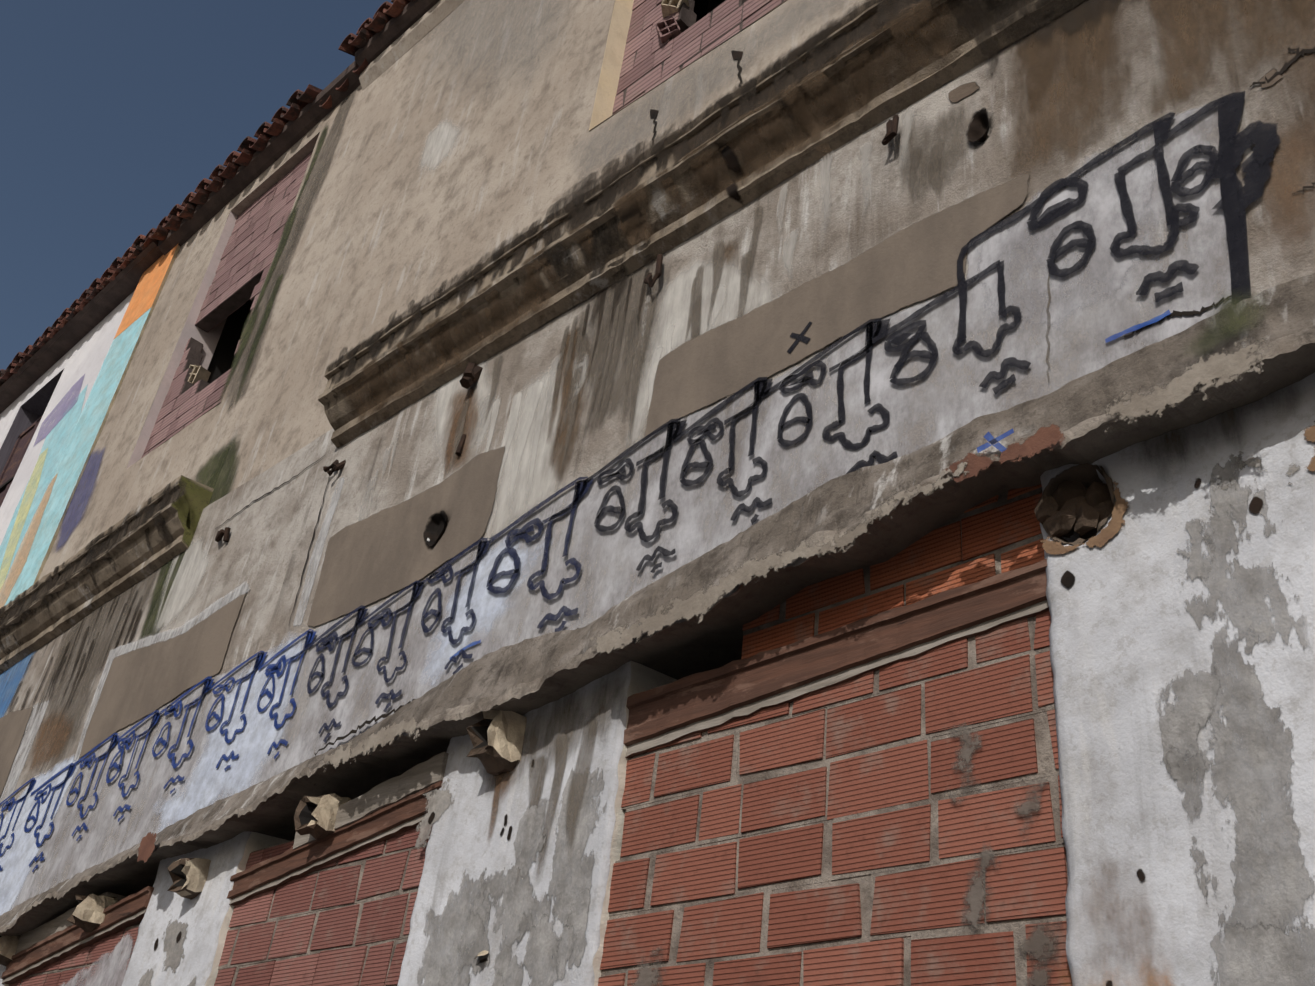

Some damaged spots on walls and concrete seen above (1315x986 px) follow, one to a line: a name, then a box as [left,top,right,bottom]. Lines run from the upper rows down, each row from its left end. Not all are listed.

water stain [1150,0,1315,112]
crack [1250,47,1315,87]
water stain [1270,137,1315,233]
water stain [327,0,1120,533]
spalling [590,424,1065,655]
hole [1061,570,1075,588]
hole [1034,463,1129,555]
spalling [1286,425,1315,485]
peeling [1158,451,1315,986]
peeling [415,768,606,986]